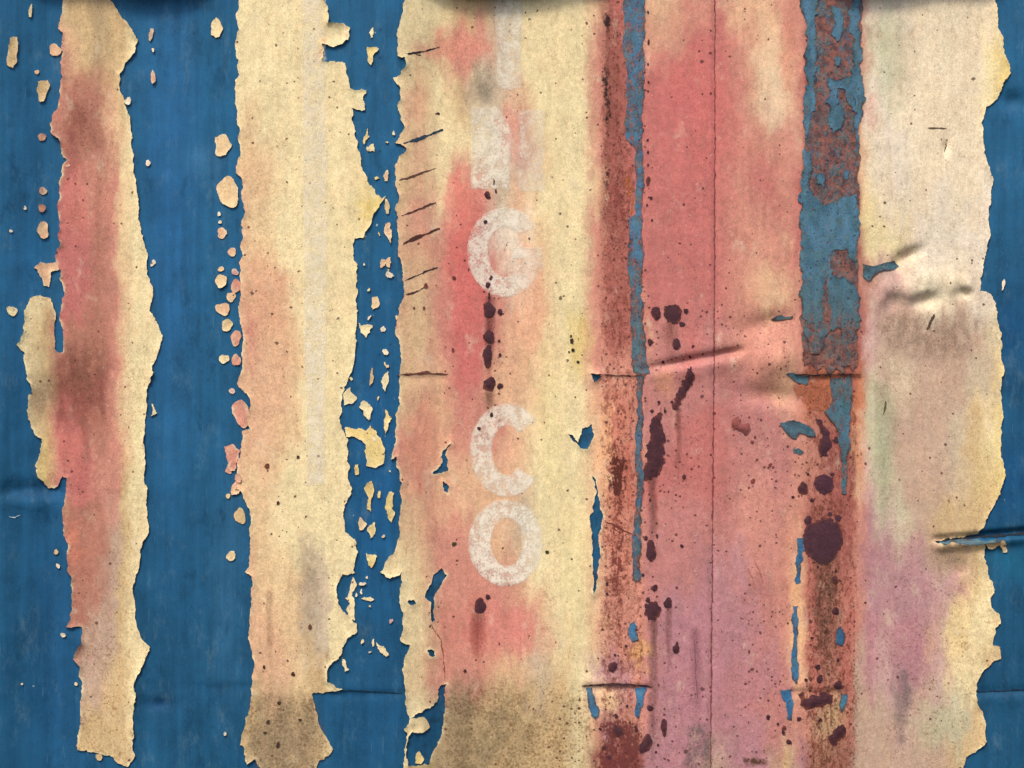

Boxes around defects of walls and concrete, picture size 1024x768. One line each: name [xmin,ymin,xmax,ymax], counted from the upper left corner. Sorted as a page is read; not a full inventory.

peeling [211,18,223,38]
rust [602,64,652,260]
peeling [6,0,163,767]
rust [482,275,503,417]
peeling [215,0,1011,768]
rust [643,304,695,517]
rust [793,380,838,457]
rust [475,594,491,643]
rust [606,396,628,672]
rust [644,534,658,562]
rust [766,472,846,767]
rust [595,705,667,768]